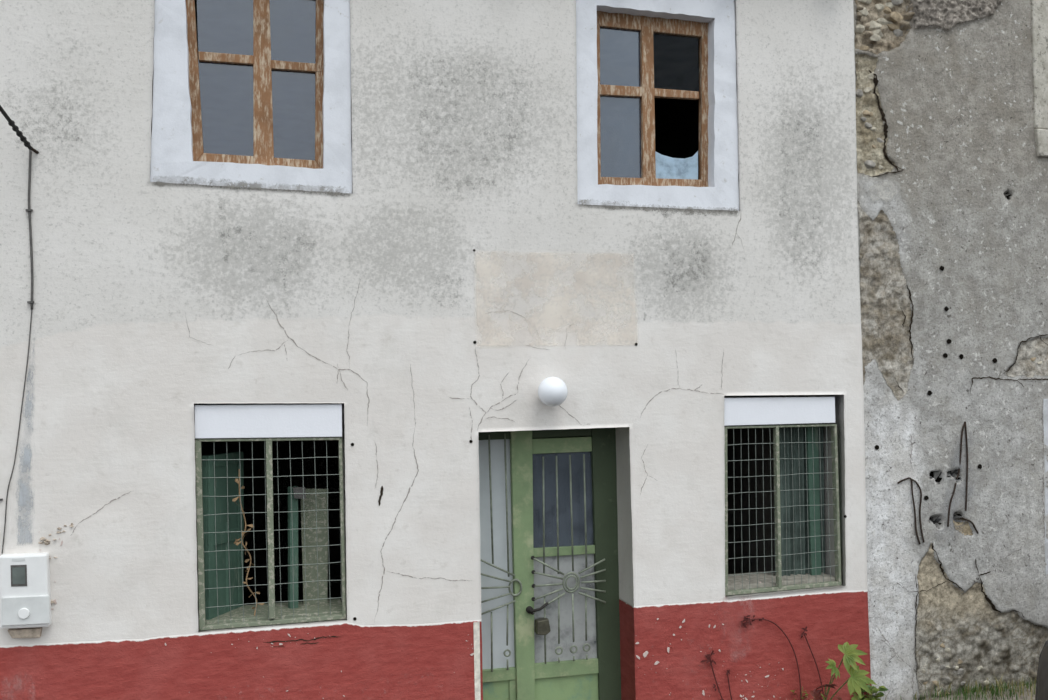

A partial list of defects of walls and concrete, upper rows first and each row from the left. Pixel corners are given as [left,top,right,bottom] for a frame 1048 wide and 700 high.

spalling [854,0,1002,177]
crack [229,279,378,481]
crack [640,352,724,418]
spalling [857,201,914,400]
spalling [1005,337,1048,378]
crack [374,367,468,622]
spalling [929,469,962,484]
spalling [929,511,973,535]
spalling [915,543,1048,700]